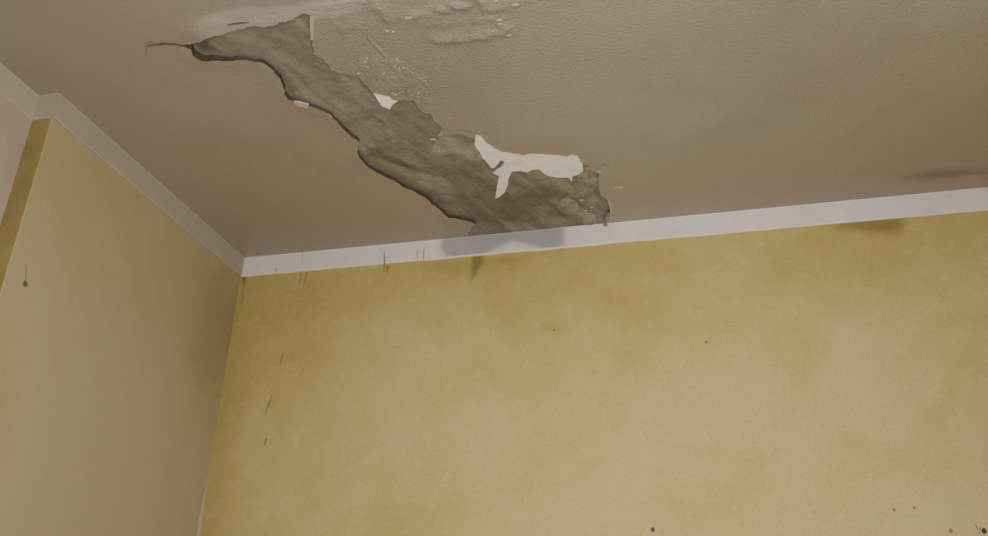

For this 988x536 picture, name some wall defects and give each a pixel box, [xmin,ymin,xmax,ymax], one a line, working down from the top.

spalling [178,14,612,236]